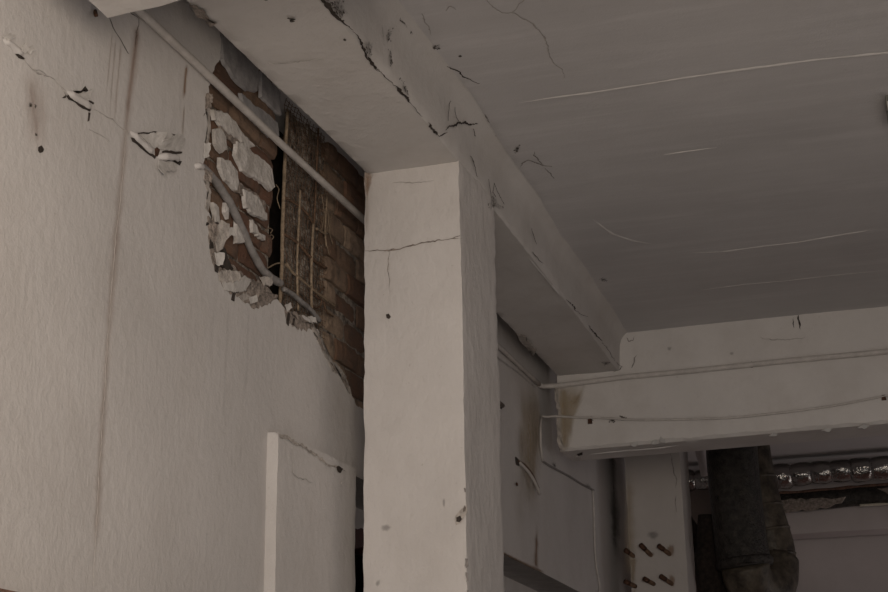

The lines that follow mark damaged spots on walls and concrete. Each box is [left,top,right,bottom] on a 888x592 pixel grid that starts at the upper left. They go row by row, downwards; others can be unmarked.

crack [321,0,496,137]
spalling [62,86,94,122]
spalling [130,131,185,174]
spalling [189,5,366,409]
crack [365,235,462,291]
crack [760,315,802,341]
crack [272,431,345,484]